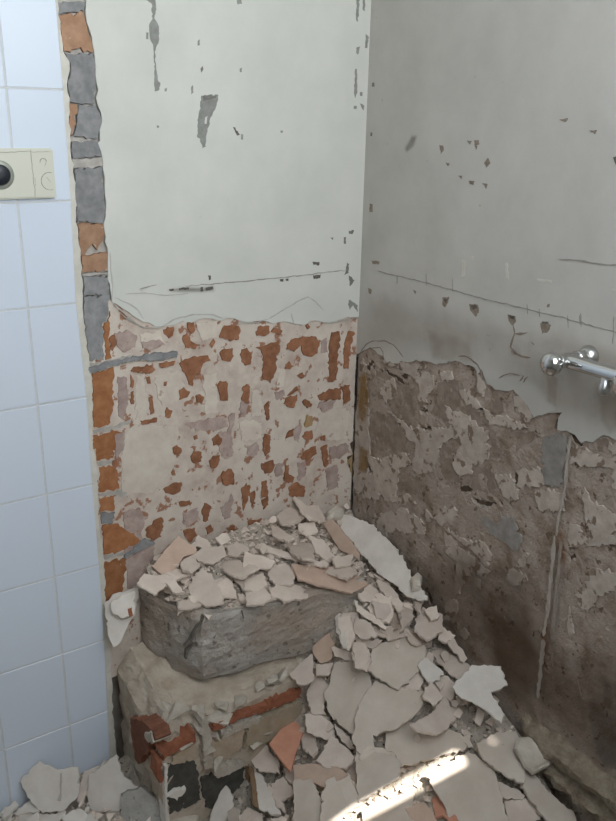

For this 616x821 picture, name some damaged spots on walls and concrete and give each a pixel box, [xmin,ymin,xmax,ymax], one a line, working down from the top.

flaking render [58,0,115,362]
peeling [146,0,167,91]
peeling [191,85,218,148]
spalling [88,300,616,821]